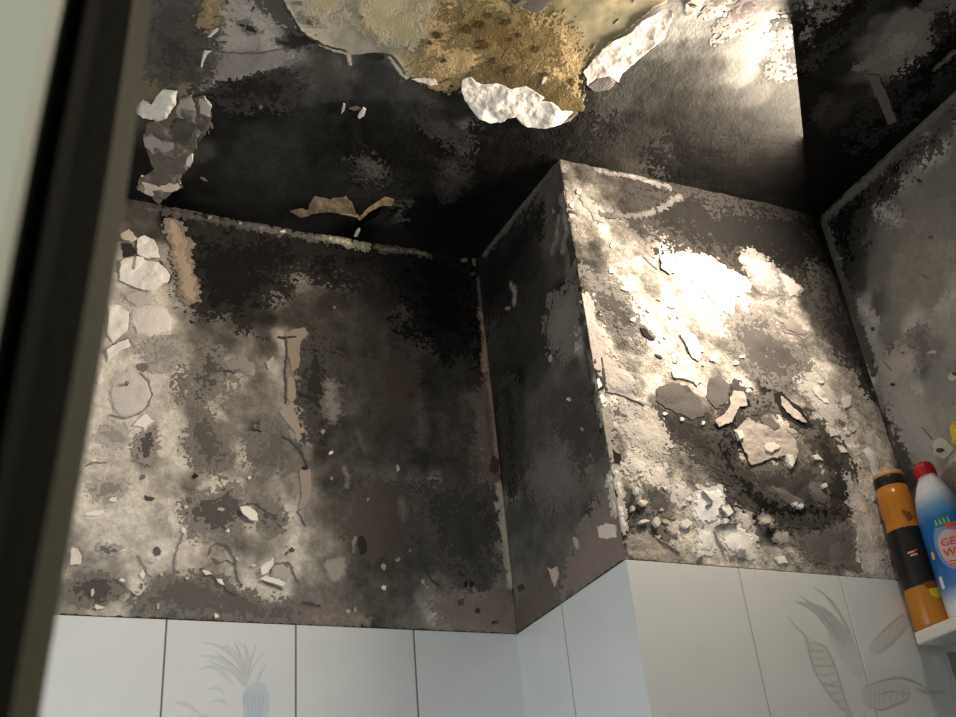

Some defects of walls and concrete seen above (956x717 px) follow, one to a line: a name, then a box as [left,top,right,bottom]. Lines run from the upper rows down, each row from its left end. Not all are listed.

water stain [139,0,521,109]
peeling [248,0,673,129]
peeling [136,83,212,204]
flaking render [119,217,202,307]
peeling [290,196,394,237]
water stain [141,113,595,361]
water stain [580,0,956,492]
peeling [107,305,131,361]
water stain [129,335,317,551]
water stain [541,266,894,579]
peeling [654,330,813,469]
water stain [61,541,312,624]